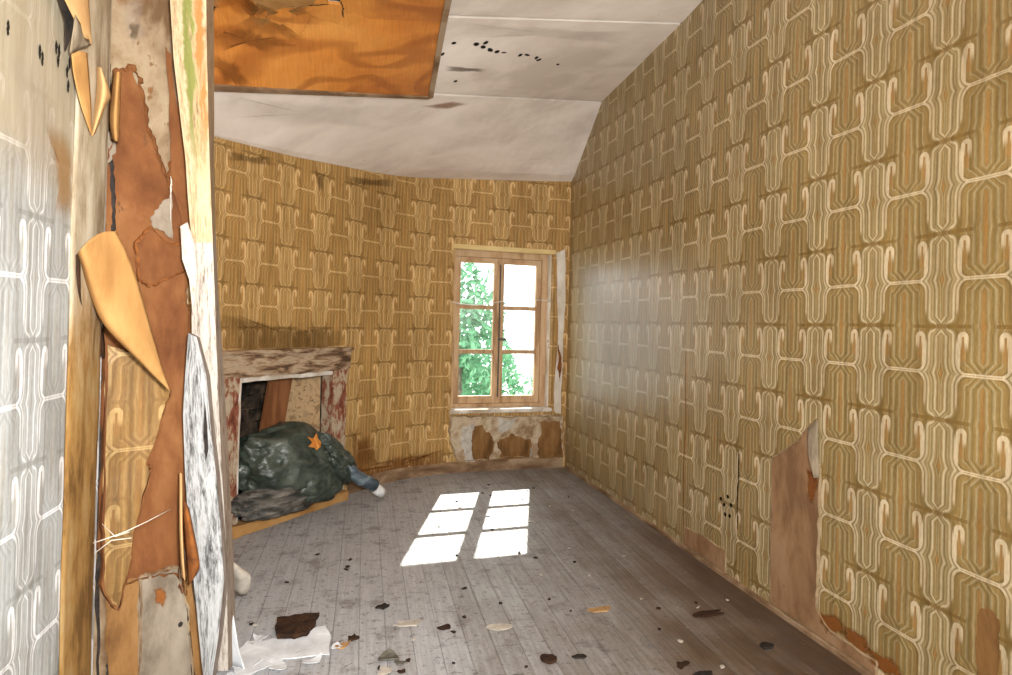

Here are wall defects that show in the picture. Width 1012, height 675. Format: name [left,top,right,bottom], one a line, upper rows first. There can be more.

leakage [39,41,71,92]
peeling [180,222,198,314]
spalling [448,249,566,462]
peeling [769,418,879,675]
spalling [104,562,203,675]
peeling [975,607,1000,675]